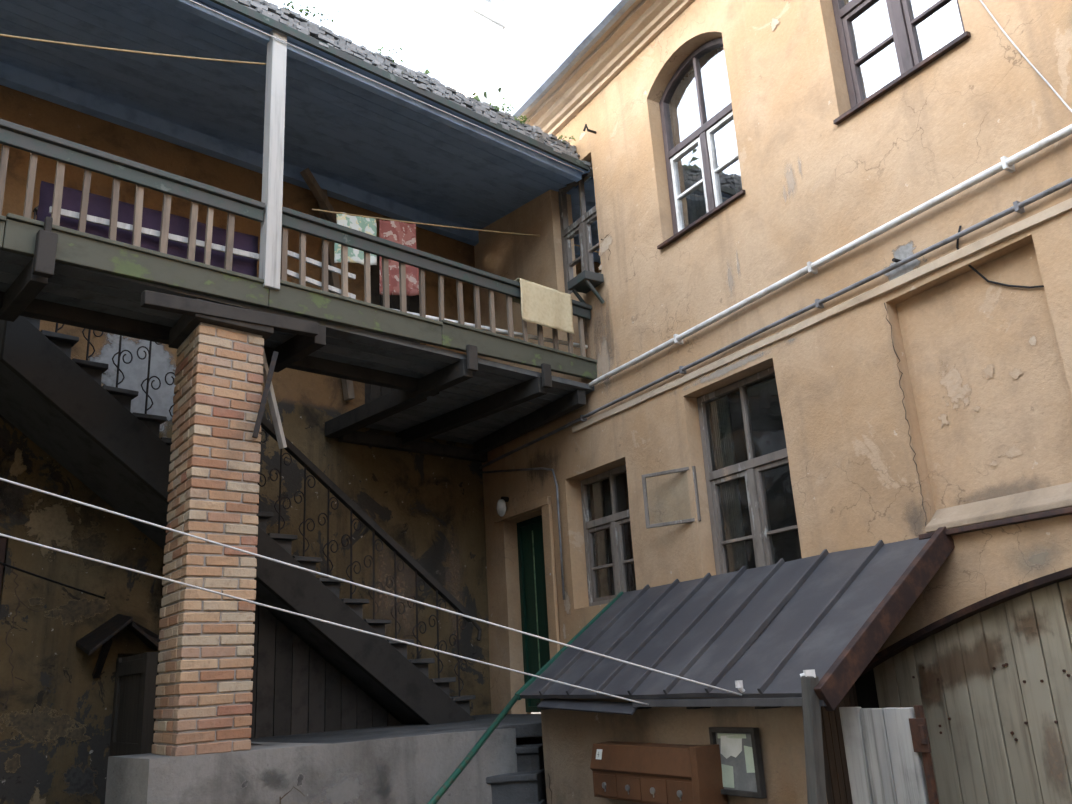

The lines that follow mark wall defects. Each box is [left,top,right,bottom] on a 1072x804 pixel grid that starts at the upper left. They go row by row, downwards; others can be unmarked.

crack [884,303,927,527]